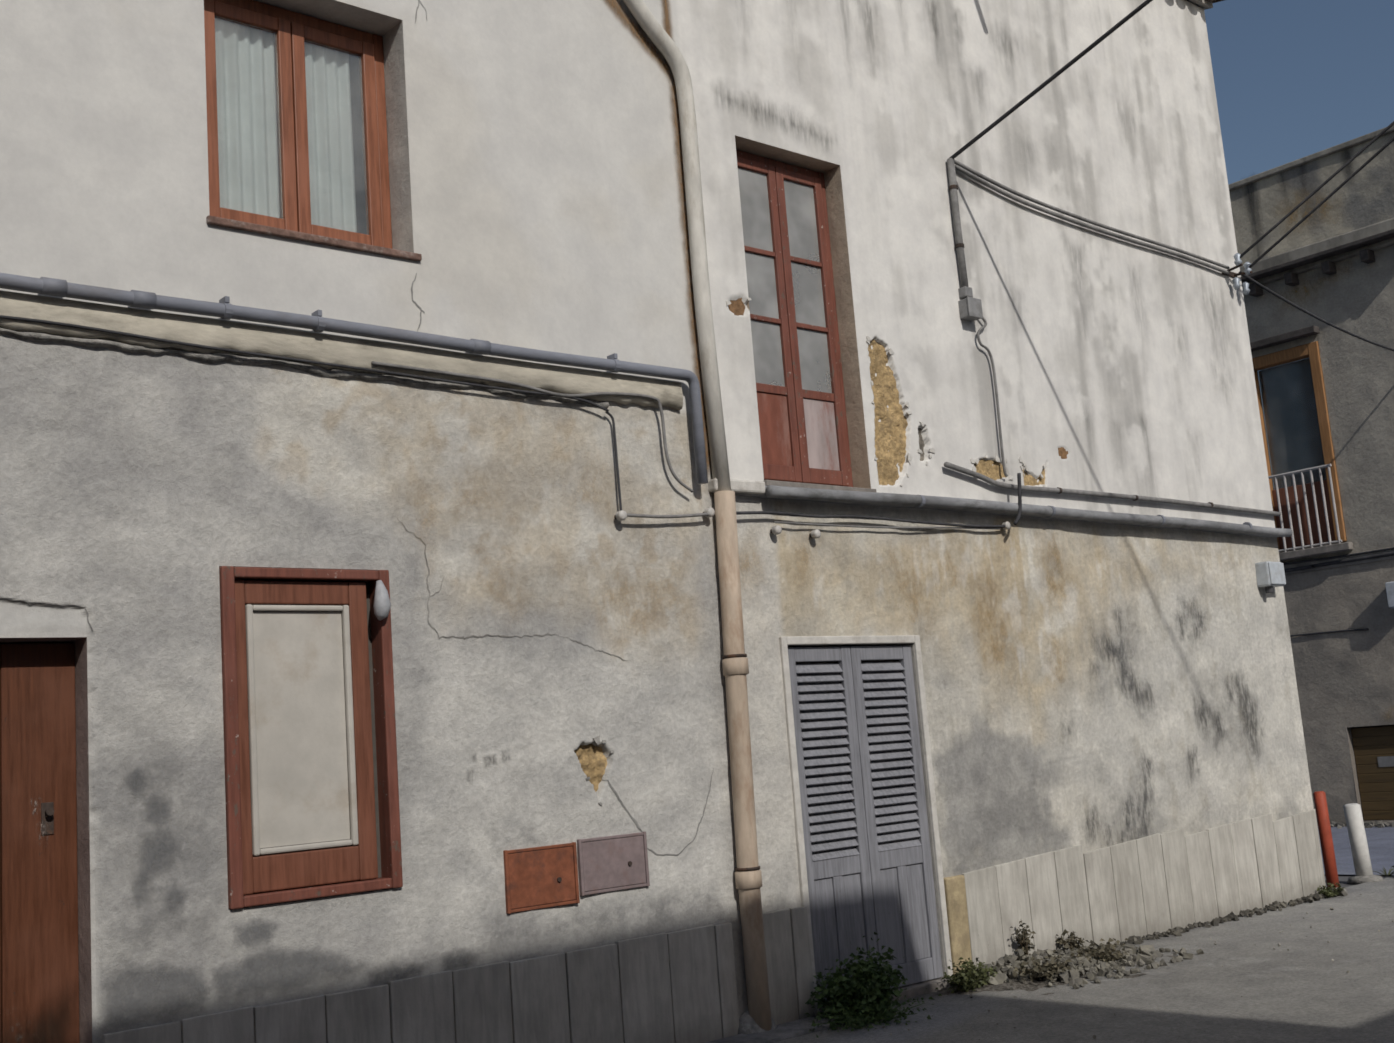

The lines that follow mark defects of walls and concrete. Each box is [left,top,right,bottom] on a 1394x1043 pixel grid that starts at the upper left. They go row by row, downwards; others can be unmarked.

spalling [726,298,751,316]
flaking render [866,336,935,487]
flaking render [970,454,1046,487]
crack [0,599,93,631]
water stain [1104,626,1152,701]
spalling [574,736,614,806]
water stain [1087,763,1150,842]
water stain [108,924,352,1025]